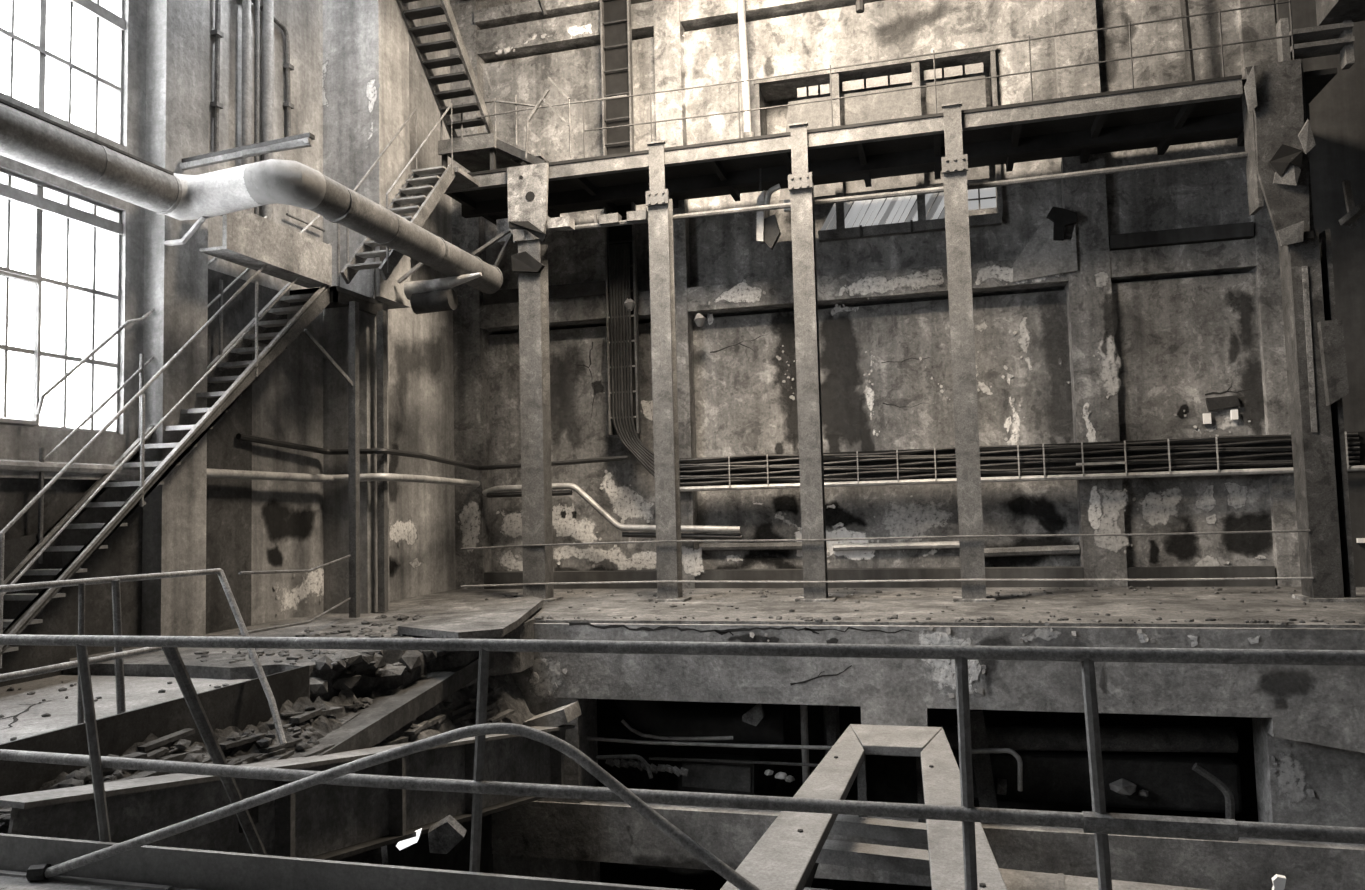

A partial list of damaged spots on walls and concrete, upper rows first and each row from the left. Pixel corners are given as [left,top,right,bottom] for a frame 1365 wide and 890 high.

spalling [831,268,944,316]
spalling [975,261,1069,285]
damp [819,312,875,453]
peeling [552,503,657,570]
peeling [600,470,654,524]
peeling [775,511,802,557]
peeling [826,495,953,563]
peeling [1088,482,1248,554]
crack [1,698,61,730]
damp [1261,672,1311,708]
spalling [492,622,1365,890]